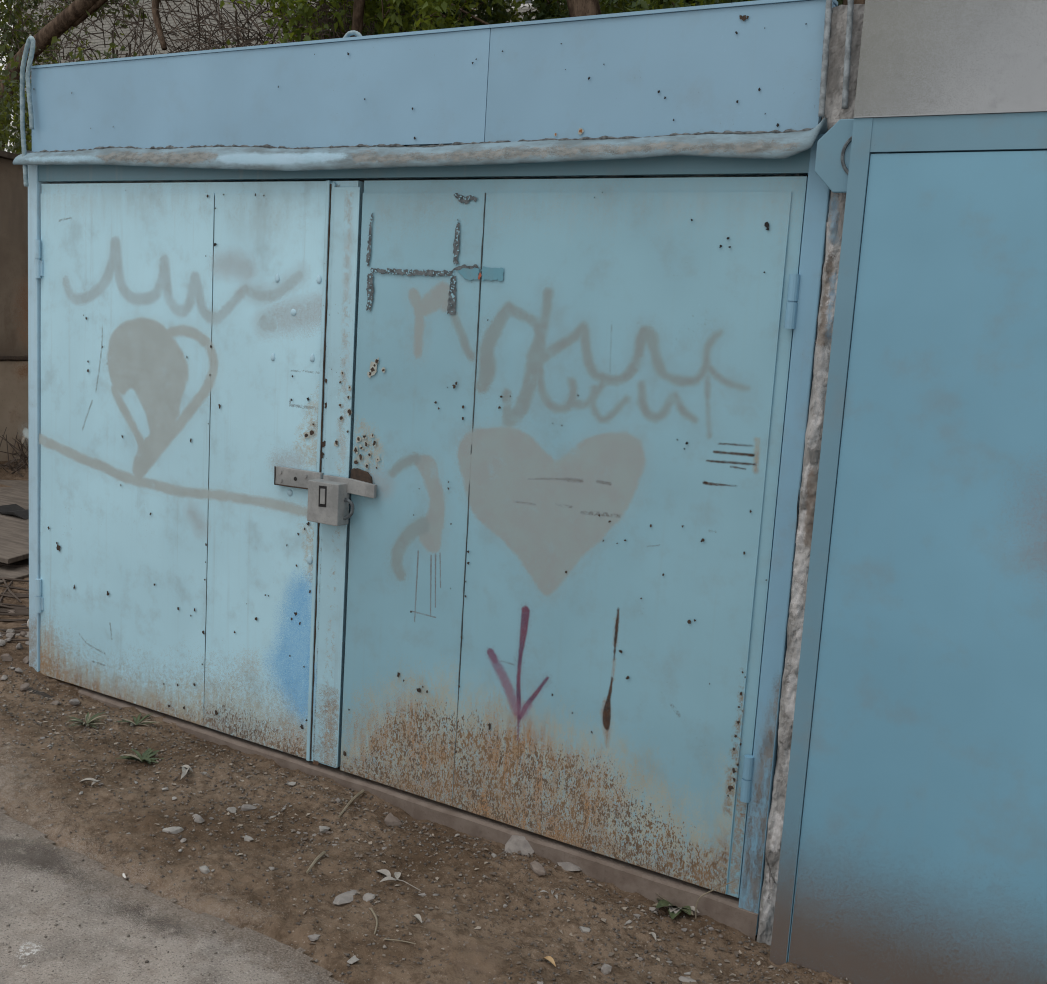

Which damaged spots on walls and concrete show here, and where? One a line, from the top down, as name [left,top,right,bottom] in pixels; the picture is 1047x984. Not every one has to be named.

peeling [454,193,477,204]
peeling [366,212,504,315]
corrosion [40,606,747,897]